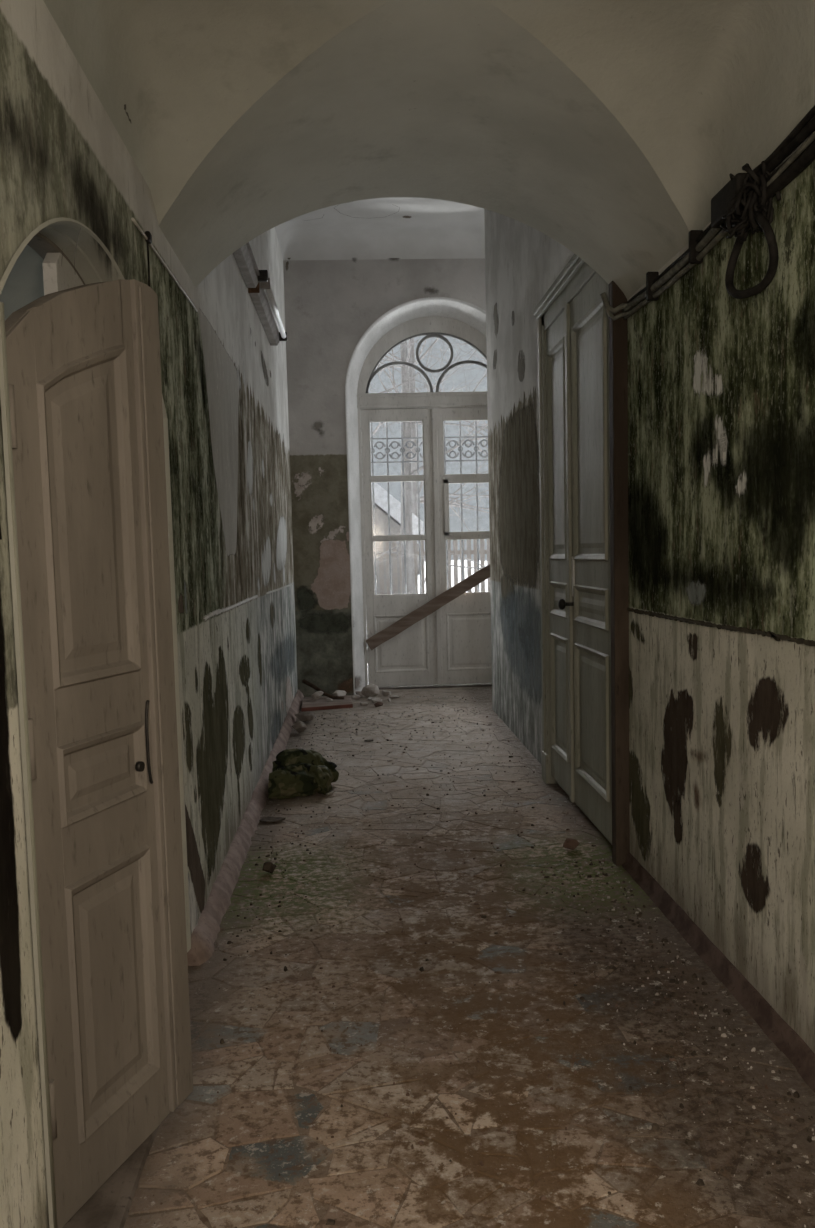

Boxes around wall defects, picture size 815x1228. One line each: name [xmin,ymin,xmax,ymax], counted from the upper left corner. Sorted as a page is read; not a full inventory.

peeling [247,442,264,511]
peeling [292,467,324,501]
water stain [694,409,815,570]
peeling [203,516,293,621]
flaking render [308,514,351,610]
water stain [628,484,774,606]
water stain [687,634,697,661]
water stain [182,605,275,880]
water stain [629,751,652,861]
water stain [661,689,732,844]
water stain [747,677,788,751]
water stain [739,843,770,914]